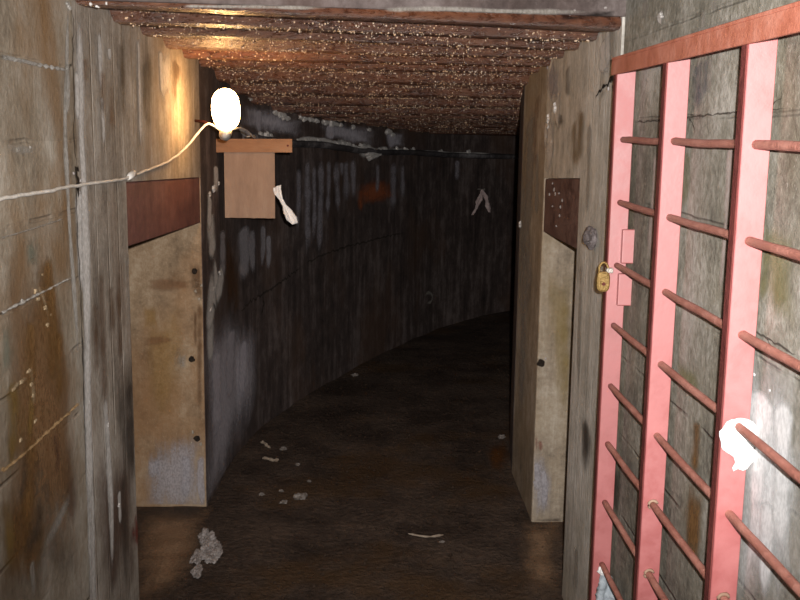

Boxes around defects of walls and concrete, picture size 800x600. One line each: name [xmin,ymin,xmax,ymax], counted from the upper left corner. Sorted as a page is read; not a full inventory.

crack [595,76,613,98]
damp [297,162,355,245]
damp [240,227,271,275]
damp [149,166,252,504]